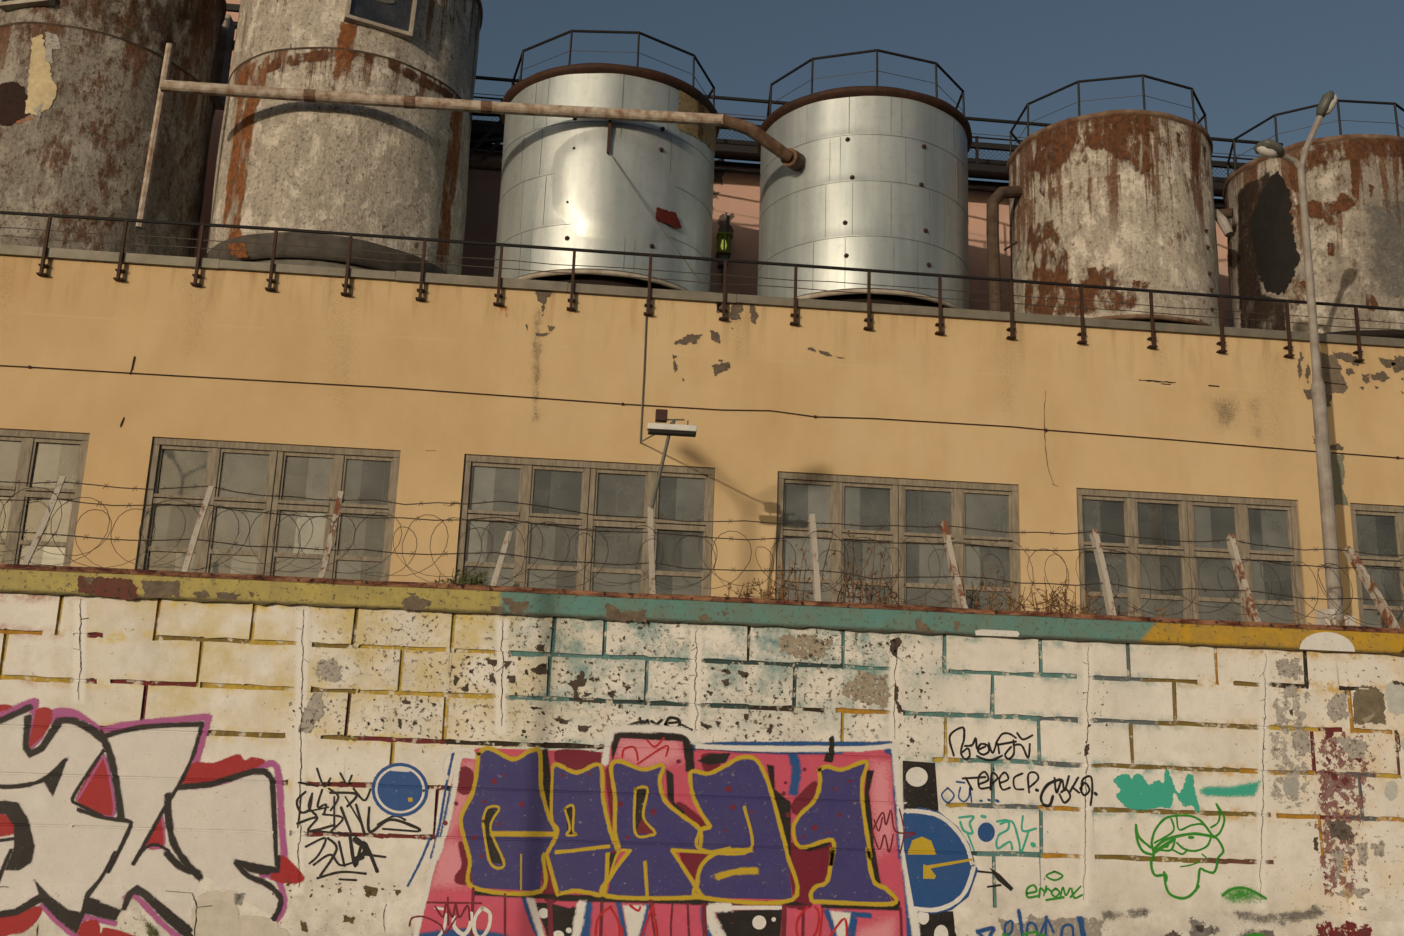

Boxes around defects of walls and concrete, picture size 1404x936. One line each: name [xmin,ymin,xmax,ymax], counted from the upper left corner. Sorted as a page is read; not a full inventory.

corrosion [51,0,210,58]
peeling [25,32,61,119]
corrosion [222,21,463,273]
corrosion [1024,111,1156,197]
corrosion [1176,128,1206,189]
corrosion [1024,218,1150,317]
corrosion [1237,139,1404,331]
flaking render [672,303,759,381]
spalling [1297,351,1404,407]
spalling [1312,436,1344,458]
spalling [1276,657,1404,899]